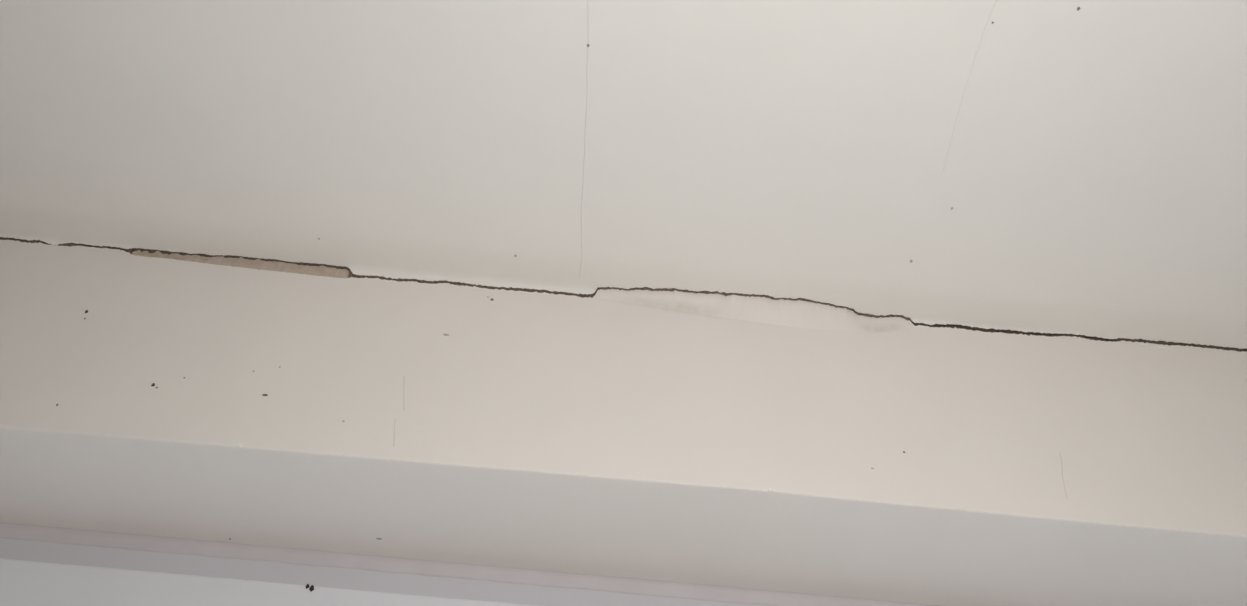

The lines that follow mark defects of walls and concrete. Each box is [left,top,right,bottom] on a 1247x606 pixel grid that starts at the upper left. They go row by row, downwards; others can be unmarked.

crack [0,237,132,254]
spalling [131,248,350,278]
crack [349,270,1247,352]